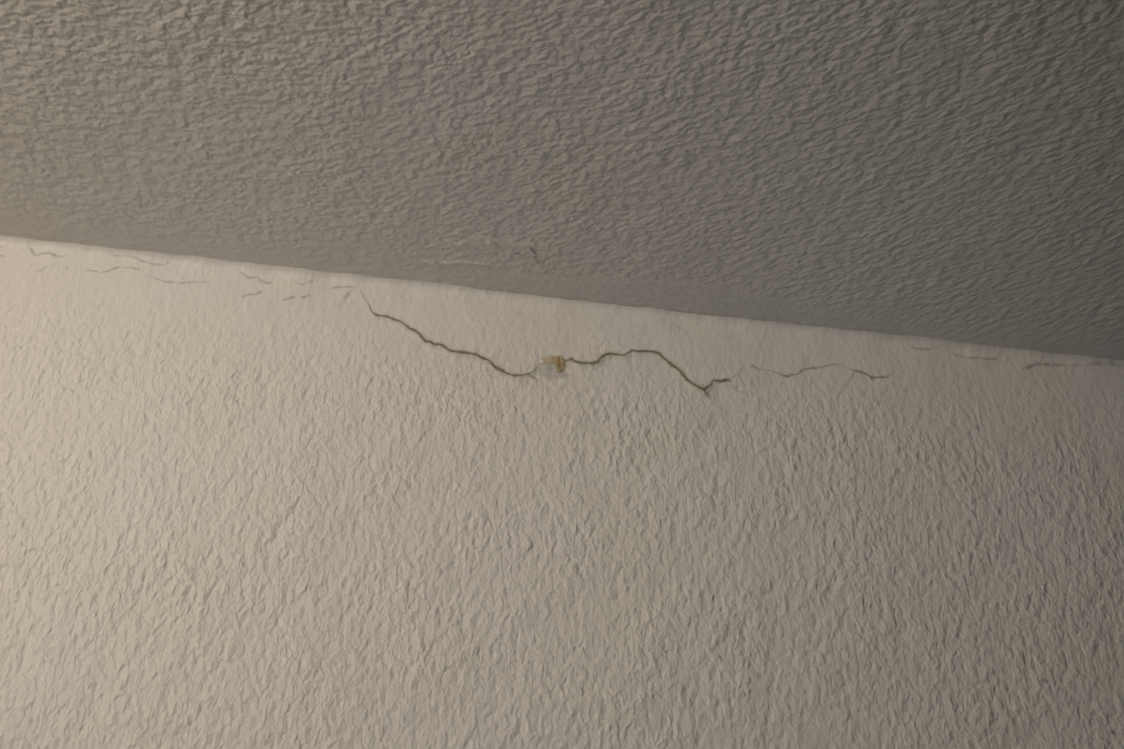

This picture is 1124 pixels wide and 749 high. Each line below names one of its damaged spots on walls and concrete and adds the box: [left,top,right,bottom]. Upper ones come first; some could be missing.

crack [370,308,530,376]
crack [567,349,729,390]